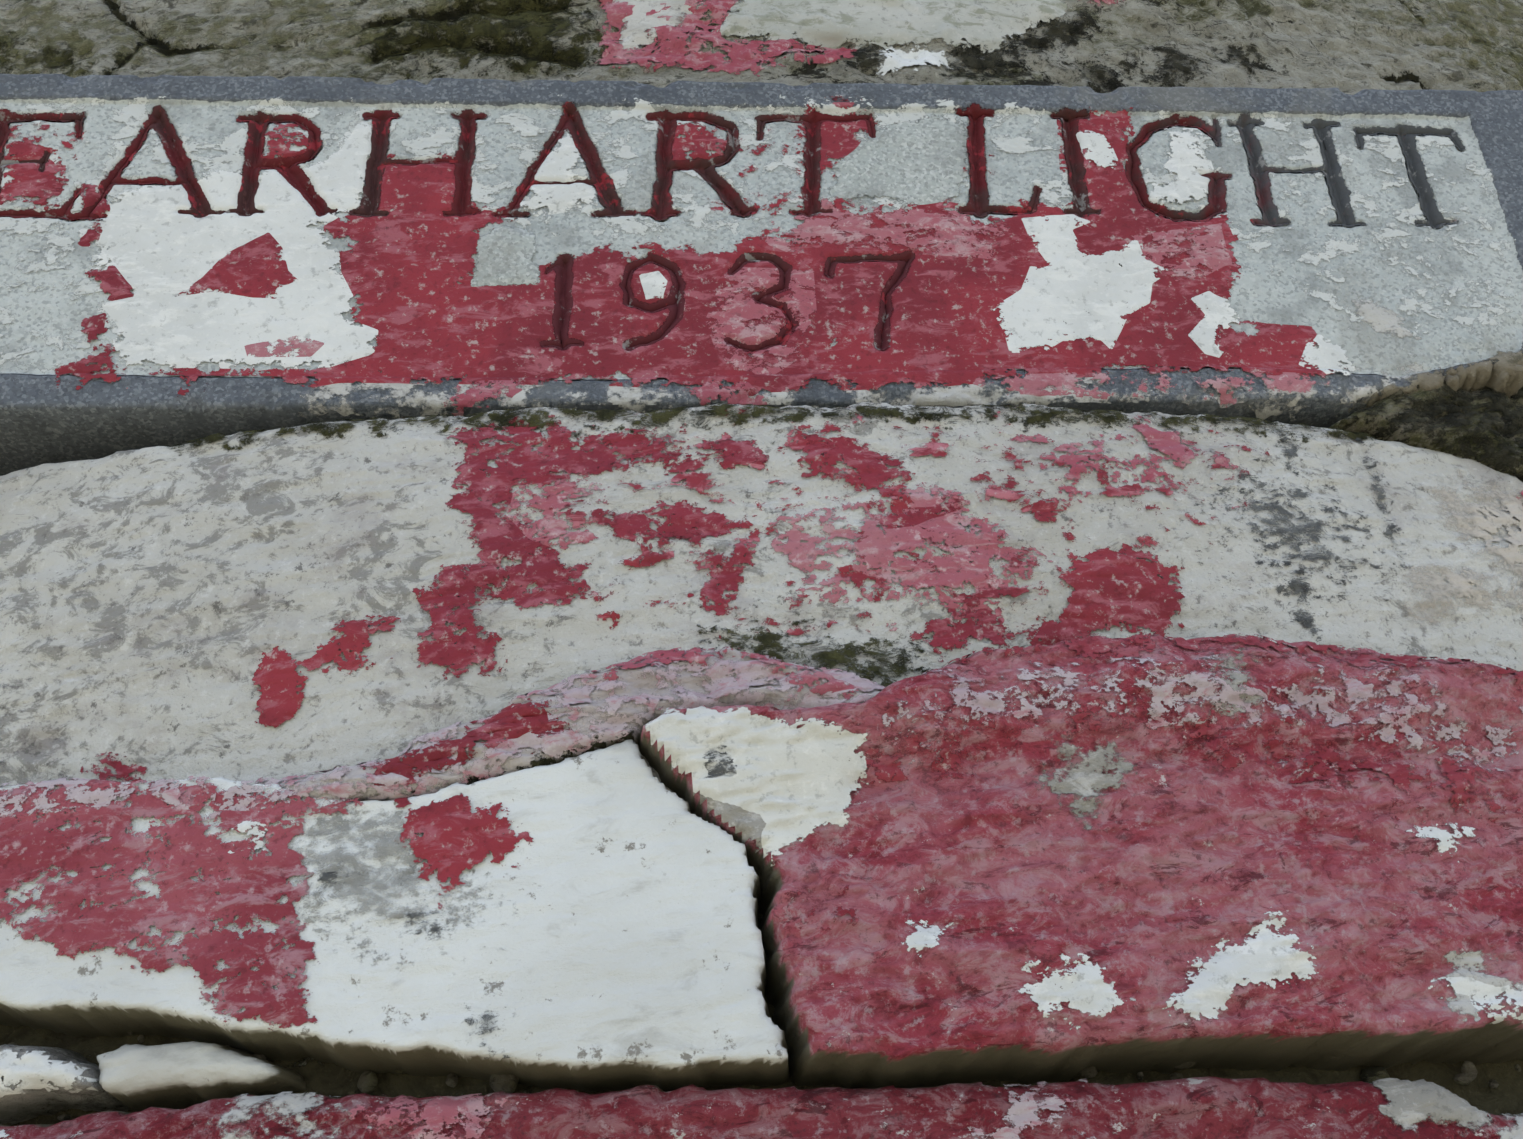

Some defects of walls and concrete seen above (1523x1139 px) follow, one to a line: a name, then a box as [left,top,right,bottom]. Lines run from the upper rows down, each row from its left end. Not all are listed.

crack [103,0,236,75]
spalling [595,0,1126,77]
peeling [0,95,1523,866]
peeling [394,793,534,909]
peeling [0,752,363,1030]
peeling [1018,947,1136,1030]
peeling [1162,907,1319,1025]
spalling [1428,951,1523,1024]
peeling [0,1049,98,1098]
peeling [219,1091,526,1139]
peeling [971,1079,1087,1139]
peeling [1370,1078,1523,1139]